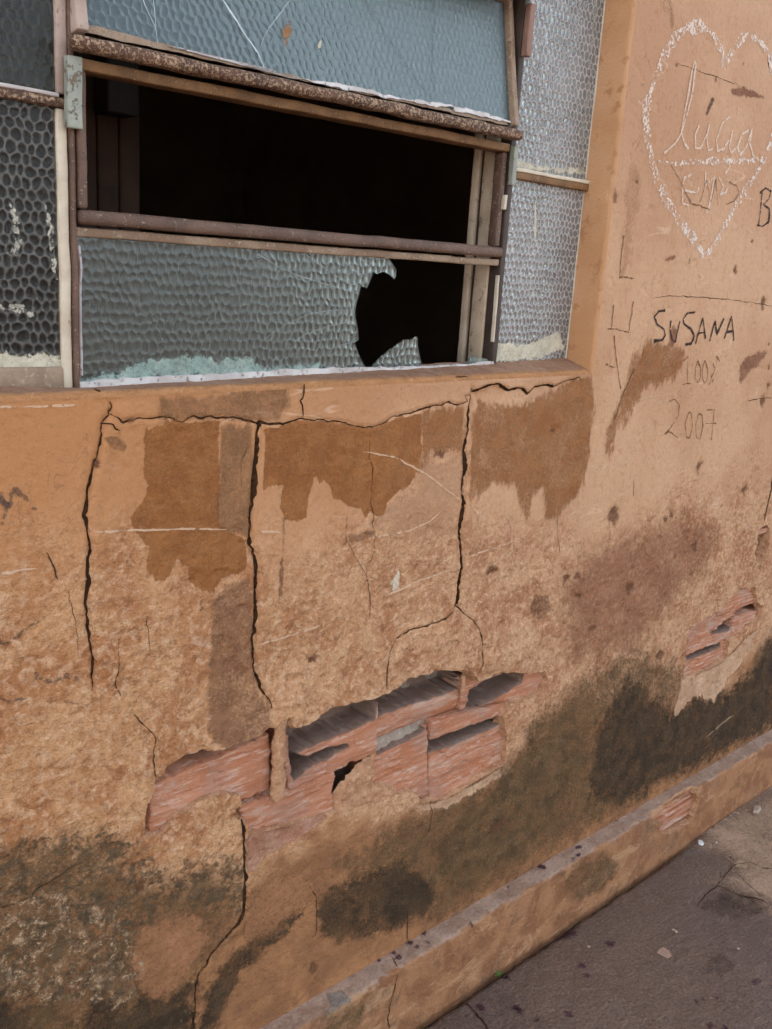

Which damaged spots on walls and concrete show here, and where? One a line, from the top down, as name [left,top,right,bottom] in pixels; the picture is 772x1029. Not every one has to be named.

leakage [606,340,684,453]
crack [46,376,580,776]
spalling [144,670,548,872]
leakage [318,524,772,948]
spalling [649,786,700,835]
spalling [674,587,762,716]
leakage [0,828,303,1029]
crack [192,819,248,1029]
crack [387,876,408,1028]